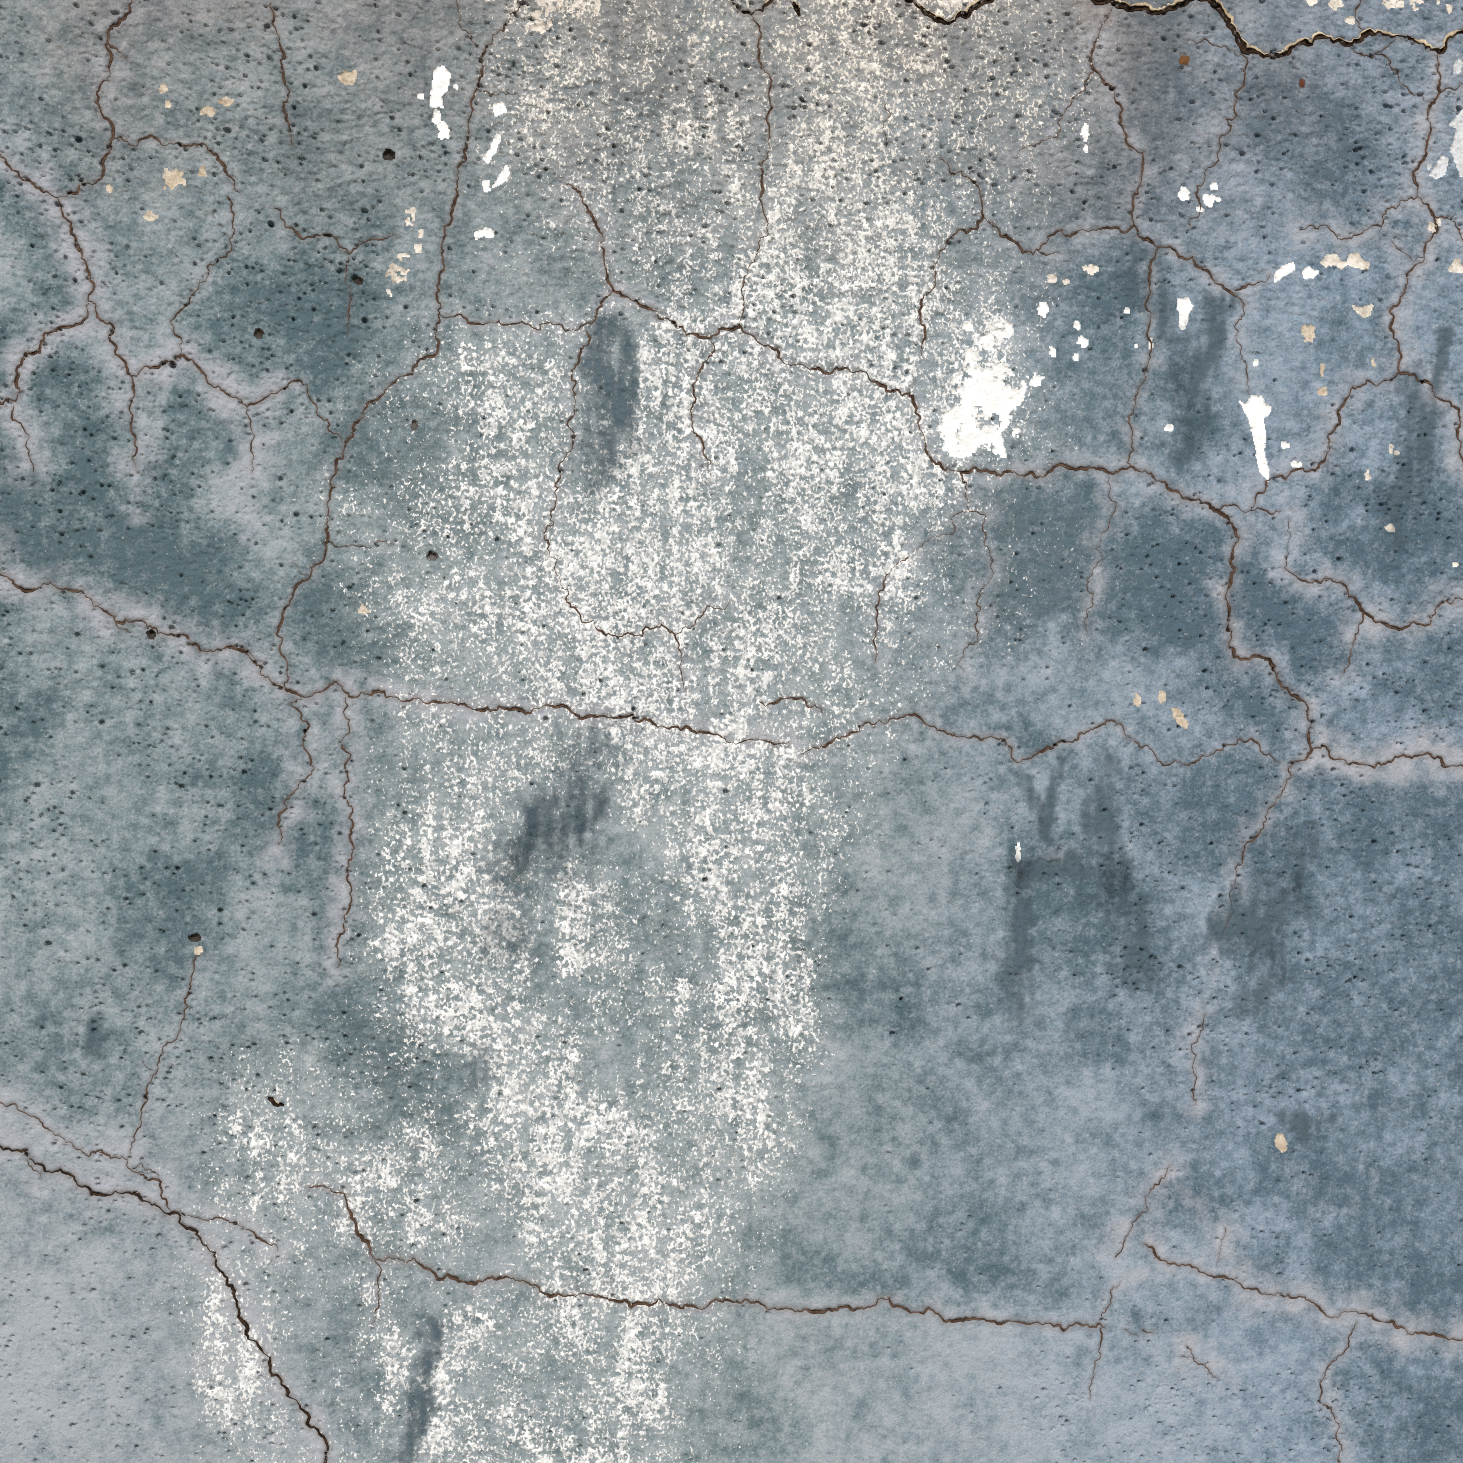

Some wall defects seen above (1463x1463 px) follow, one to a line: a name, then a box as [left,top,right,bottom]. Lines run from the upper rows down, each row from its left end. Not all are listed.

peeling [1427,109,1463,179]
crack [0,0,1463,968]
peeling [938,319,1045,458]
peeling [1037,302,1049,318]
peeling [1049,321,1089,361]
peeling [1239,395,1302,482]
leakage [151,0,1116,1463]
leakage [1083,790,1129,892]
leakage [1211,891,1299,946]
crack [1191,1016,1205,1102]
crack [0,954,329,1463]
crack [310,1168,1463,1463]